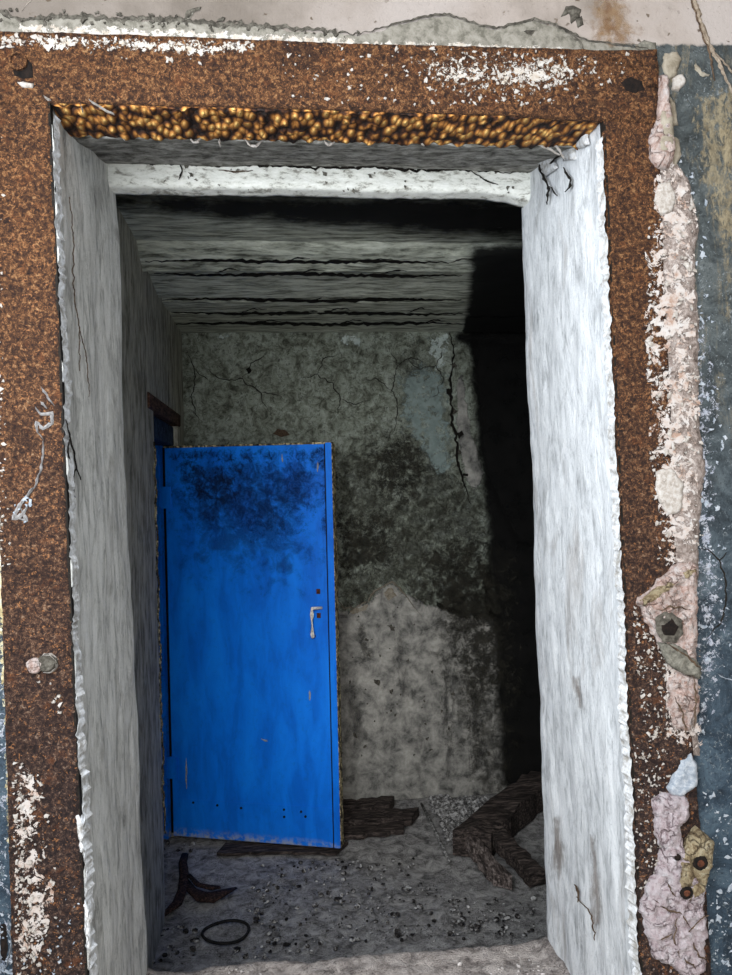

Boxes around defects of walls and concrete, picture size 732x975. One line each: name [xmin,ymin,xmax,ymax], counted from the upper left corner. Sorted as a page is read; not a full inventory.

flaking render [0,5,656,106]
damp [335,332,515,795]
flaking render [446,333,484,503]
peeling [644,78,732,756]